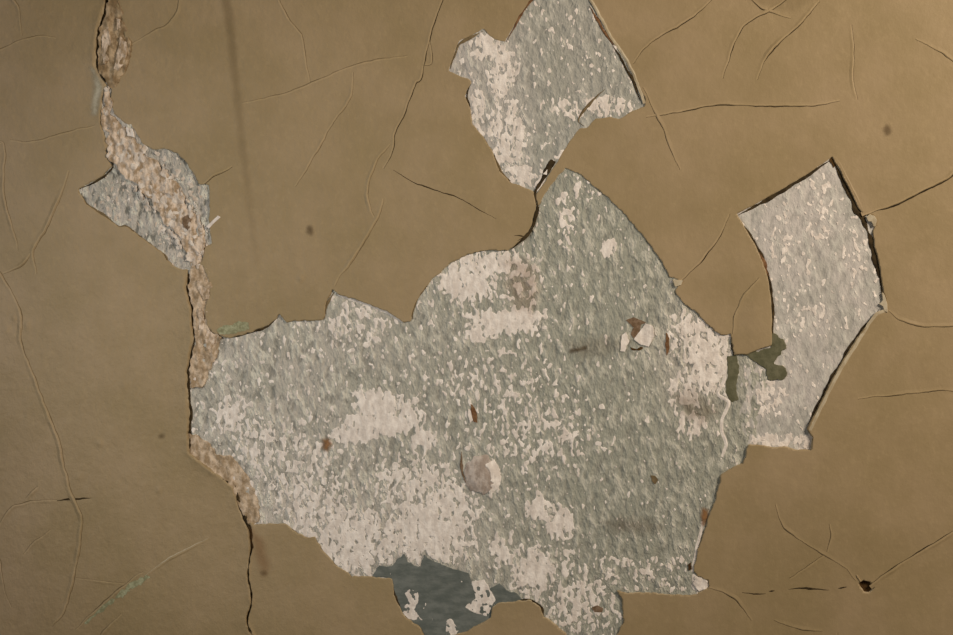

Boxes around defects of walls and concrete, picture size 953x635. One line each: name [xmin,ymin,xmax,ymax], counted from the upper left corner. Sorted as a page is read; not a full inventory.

crack [91,0,182,114]
crack [381,0,496,219]
crack [631,0,858,170]
spalling [79,82,220,274]
crack [512,159,555,249]
crack [678,213,730,280]
crack [861,169,953,217]
crack [187,262,222,388]
peeling [187,0,888,635]
crack [0,170,89,626]
crack [246,528,254,630]